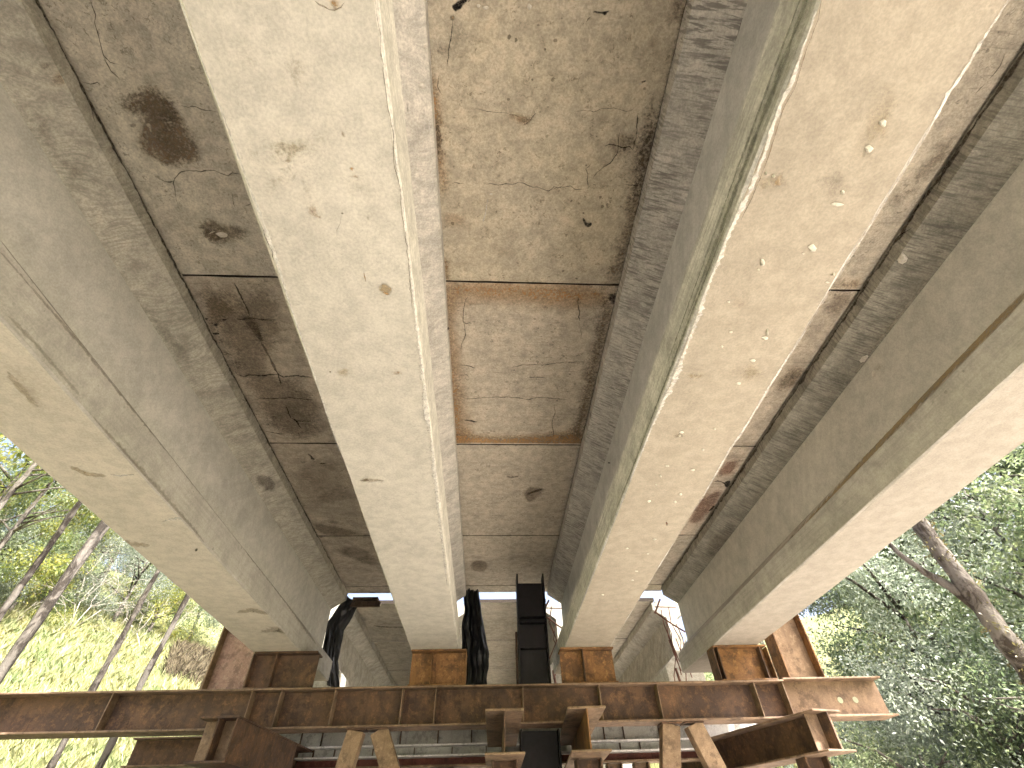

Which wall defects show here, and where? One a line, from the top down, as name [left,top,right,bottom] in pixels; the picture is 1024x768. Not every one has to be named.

damp [122,88,199,166]
corrosion [433,80,447,183]
damp [201,220,246,241]
crack [35,0,343,584]
crack [489,0,687,576]
damp [208,293,316,436]
corrosion [451,355,582,443]
crack [465,362,573,434]
corrosion [691,492,719,522]